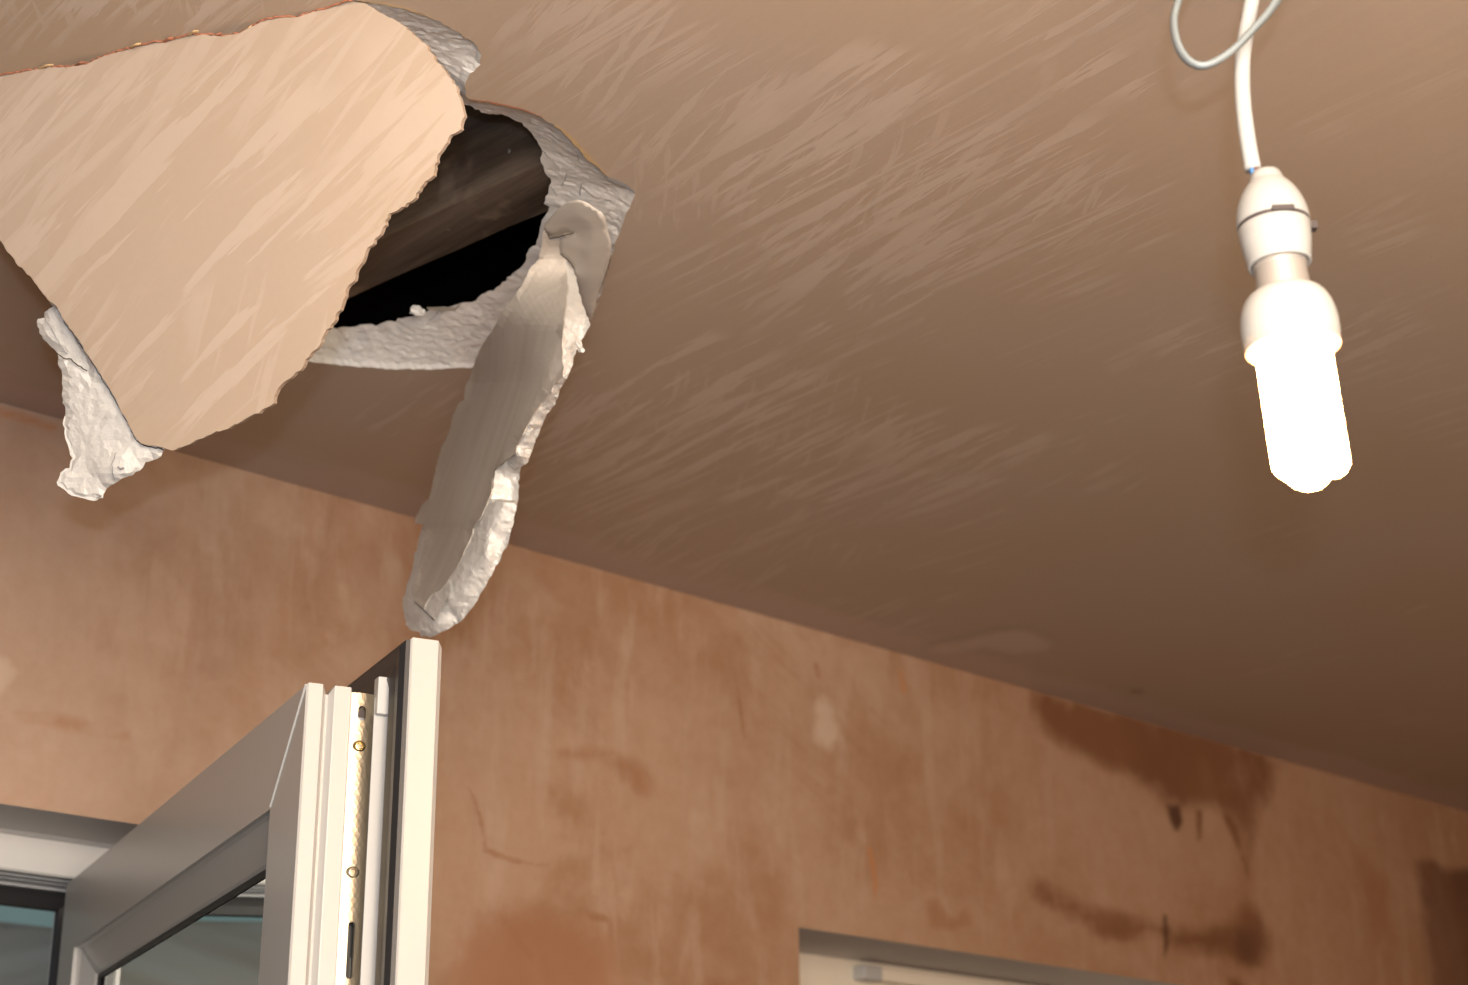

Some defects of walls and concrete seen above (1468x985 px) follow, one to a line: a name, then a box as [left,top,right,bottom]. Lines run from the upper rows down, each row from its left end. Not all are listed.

peeling [410,305,426,316]
peeling [426,581,451,620]
damp [1018,688,1468,985]